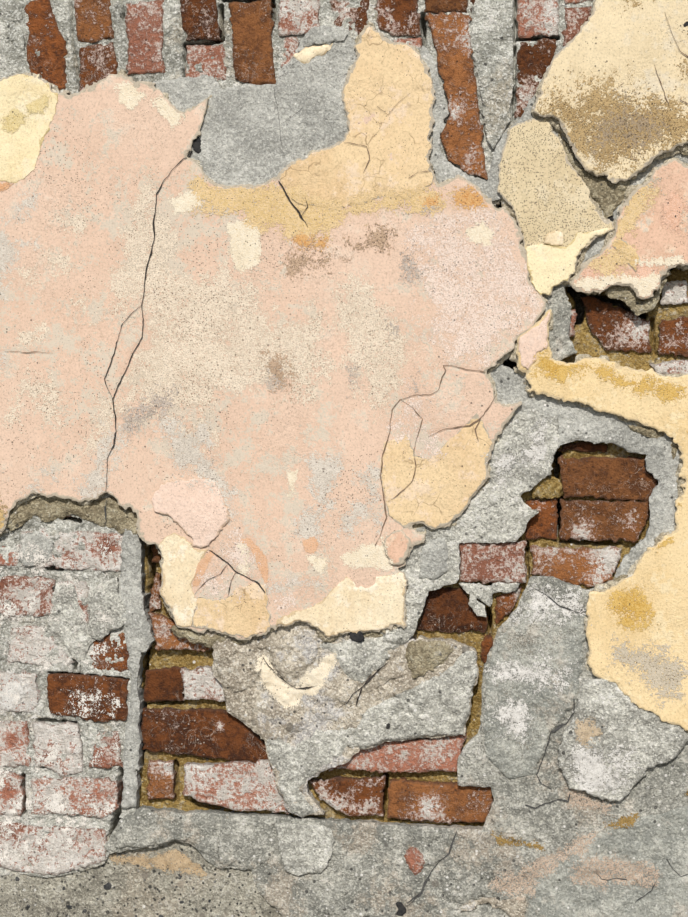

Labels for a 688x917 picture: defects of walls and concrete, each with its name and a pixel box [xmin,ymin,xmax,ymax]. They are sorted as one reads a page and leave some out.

peeling [279,0,595,212]
crack [104,151,193,527]
peeling [0,0,493,639]
peeling [518,311,550,370]
spalling [525,228,688,371]
spalling [413,440,650,750]
spalling [0,599,485,878]